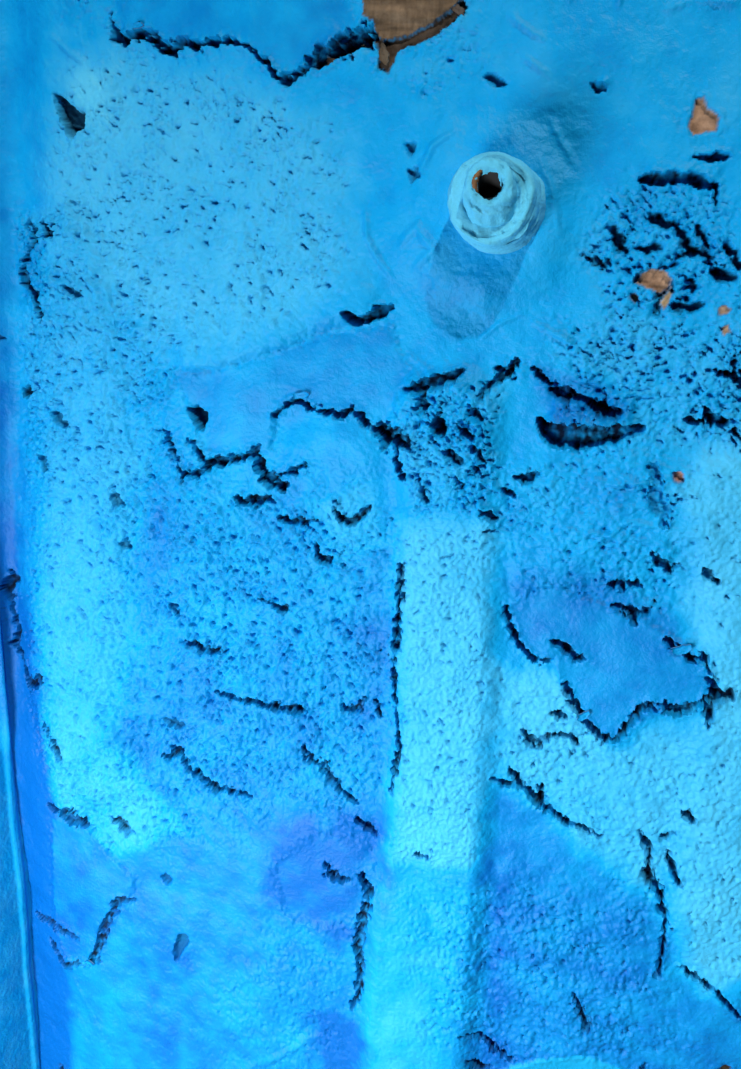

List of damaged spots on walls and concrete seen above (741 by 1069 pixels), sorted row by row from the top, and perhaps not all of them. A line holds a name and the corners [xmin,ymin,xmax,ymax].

crack [107,10,380,87]
spalling [314,0,467,75]
crack [637,150,733,209]
peeling [688,96,721,137]
crack [162,428,372,567]
crack [270,357,647,535]
crack [501,461,737,751]
crack [342,562,407,797]
crack [488,767,605,839]
crack [322,861,375,1012]
crack [638,808,741,1021]
peeling [507,1055,622,1069]